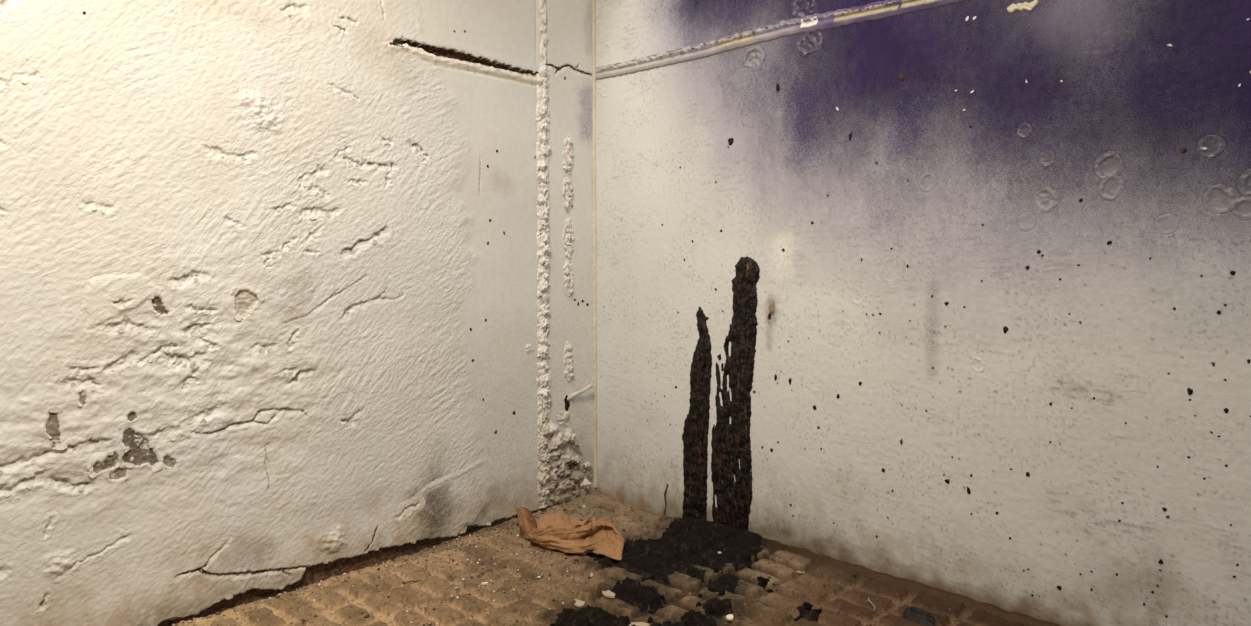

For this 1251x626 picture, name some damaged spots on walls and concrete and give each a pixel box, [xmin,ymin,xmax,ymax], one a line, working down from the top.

crack [546,64,592,75]
spalling [0,129,436,504]
crack [195,368,316,488]
spalling [391,494,426,524]
crack [177,564,306,575]